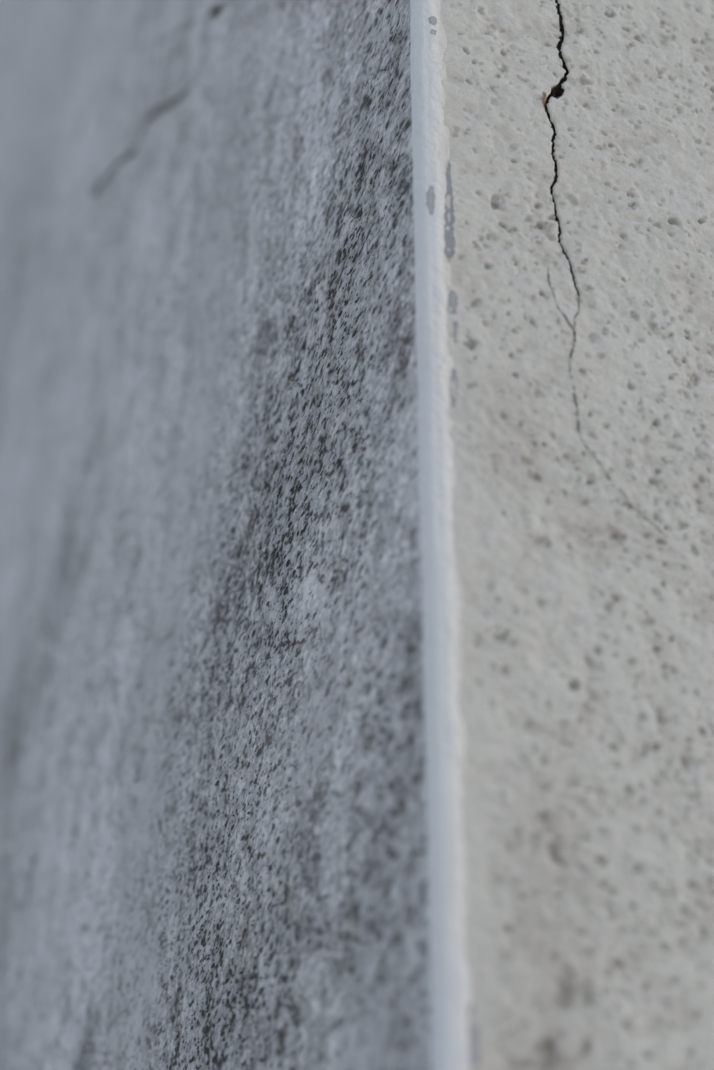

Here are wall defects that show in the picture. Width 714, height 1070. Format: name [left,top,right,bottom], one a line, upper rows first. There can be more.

crack [208,1,228,17]
crack [544,0,666,536]